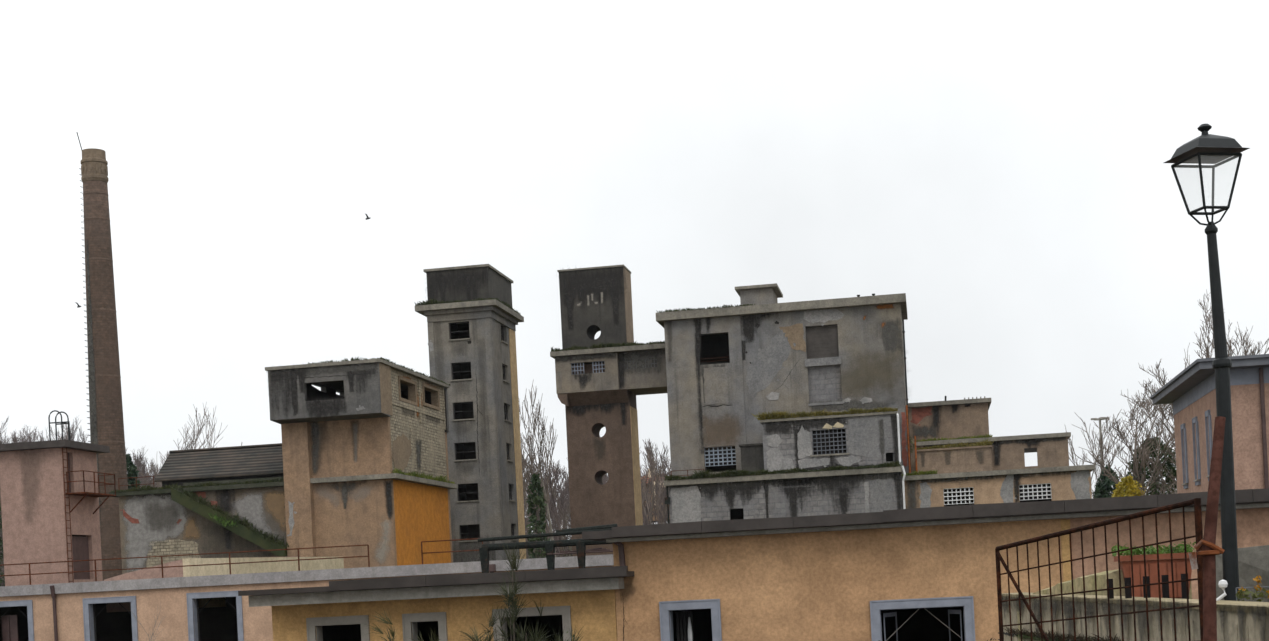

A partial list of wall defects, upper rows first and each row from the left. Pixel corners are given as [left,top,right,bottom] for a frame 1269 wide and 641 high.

damp [740,313,770,360]
flaking render [121,494,201,571]
flaking render [195,492,297,538]
damp [270,368,374,473]
damp [333,482,356,509]
damp [671,400,1083,518]